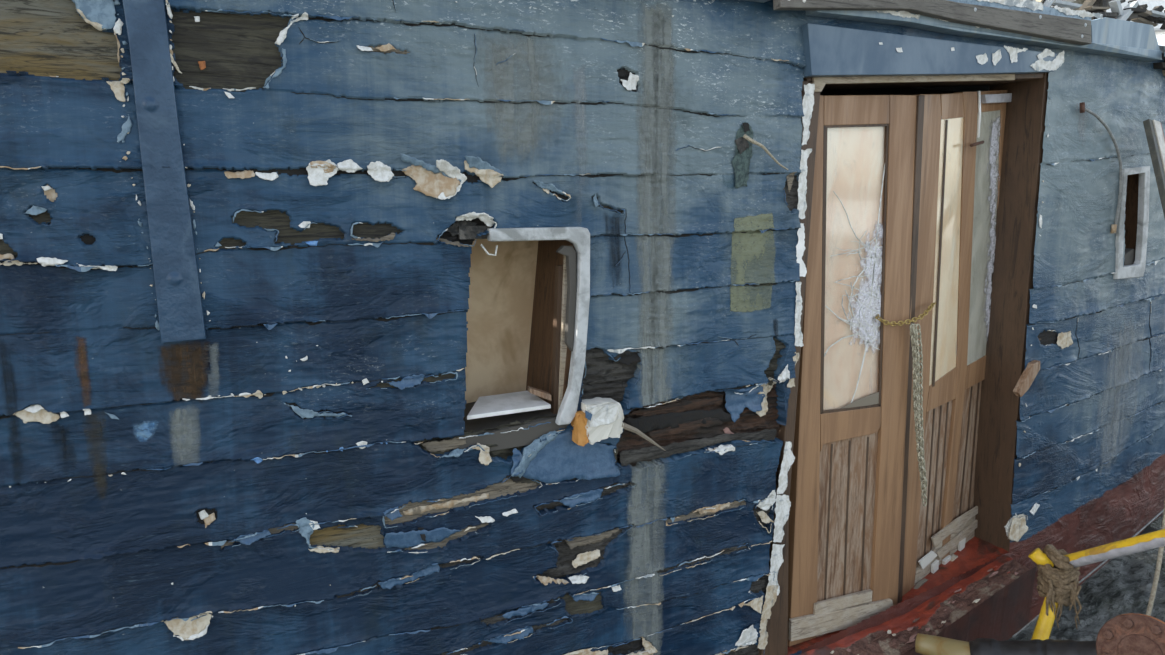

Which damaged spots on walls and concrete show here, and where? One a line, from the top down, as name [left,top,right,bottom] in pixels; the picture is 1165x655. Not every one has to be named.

peeling [0,0,132,161]
peeling [166,0,308,98]
peeling [23,184,57,224]
peeling [0,234,118,271]
peeling [187,184,211,321]
corrosion [79,339,89,393]
corrosion [161,343,207,401]
peeling [215,83,815,655]